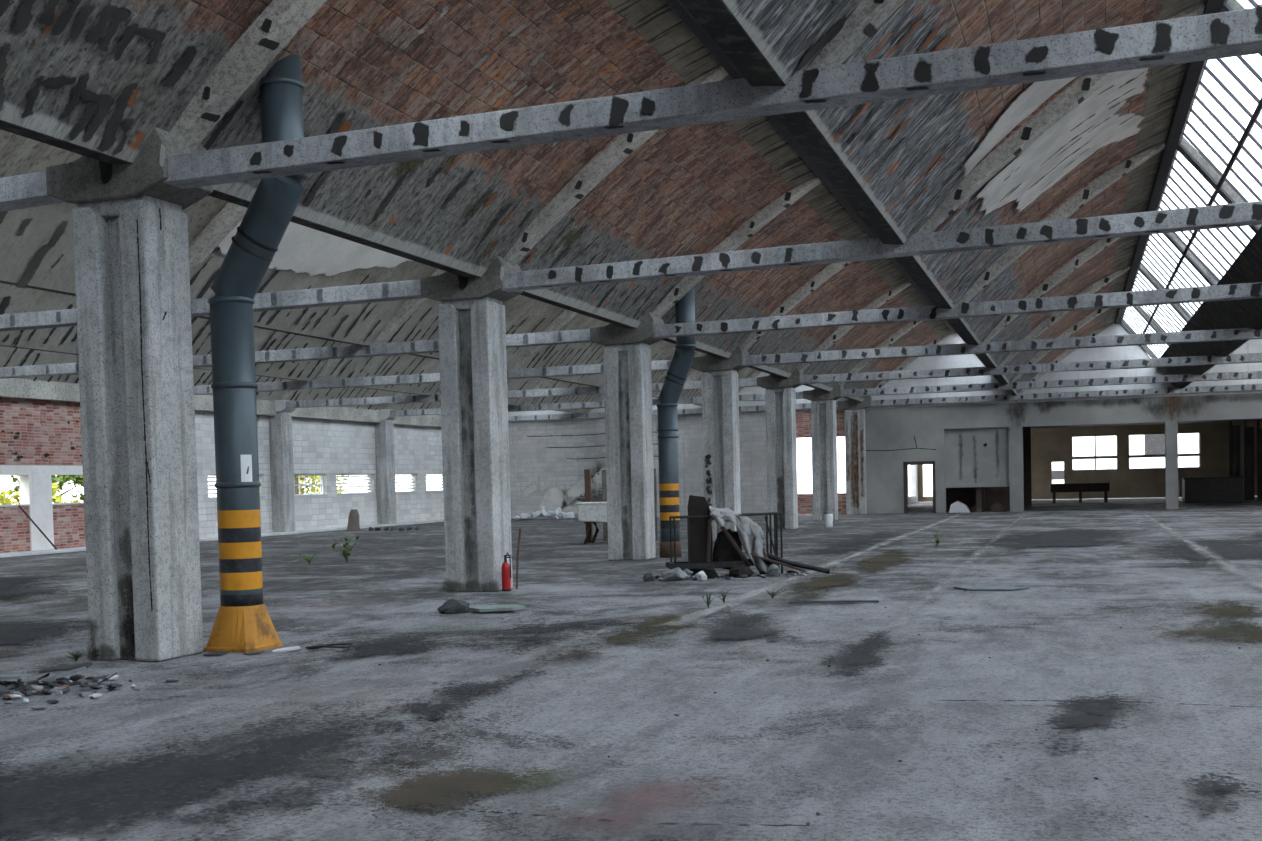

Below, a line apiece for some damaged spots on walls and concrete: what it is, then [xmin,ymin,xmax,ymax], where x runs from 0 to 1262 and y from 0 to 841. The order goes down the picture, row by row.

damp [0,0,165,111]
damp [162,46,198,87]
damp [797,16,846,104]
damp [21,73,138,184]
peeling [942,68,1148,228]
peeling [218,220,242,255]
peeling [268,222,413,276]